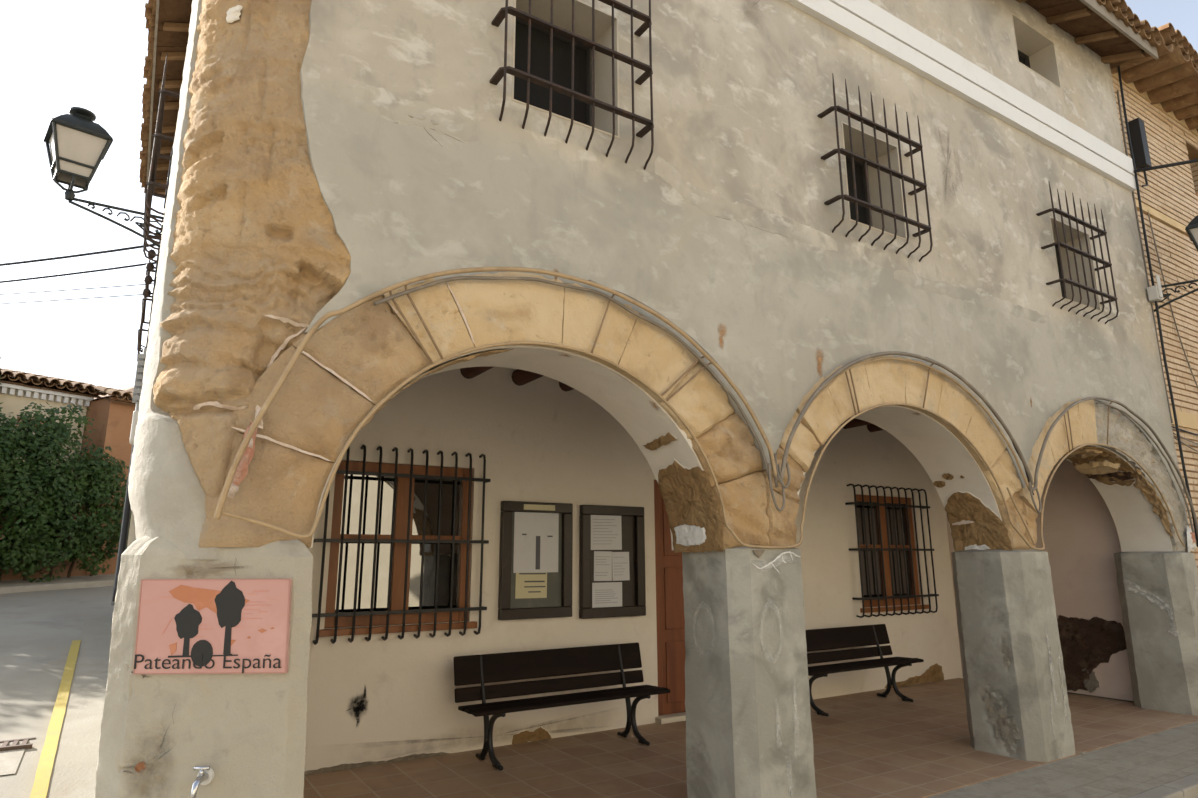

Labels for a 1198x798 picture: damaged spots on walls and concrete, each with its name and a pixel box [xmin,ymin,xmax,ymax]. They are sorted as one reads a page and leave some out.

peeling [643,431,724,553]
peeling [933,473,1013,552]